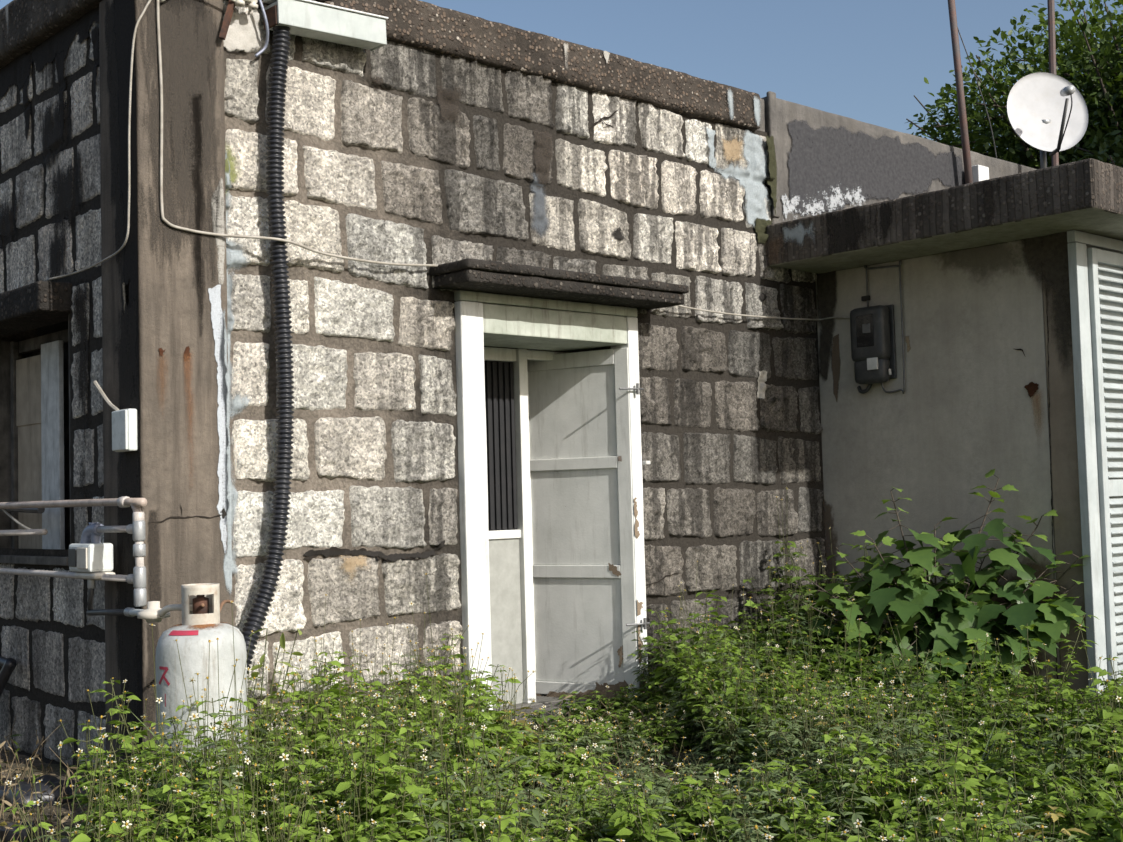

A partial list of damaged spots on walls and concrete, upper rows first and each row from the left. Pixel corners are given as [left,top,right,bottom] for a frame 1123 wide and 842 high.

peeling [706,127,769,226]
peeling [782,186,866,243]
damp [0,0,225,763]
rust [1024,382,1039,417]